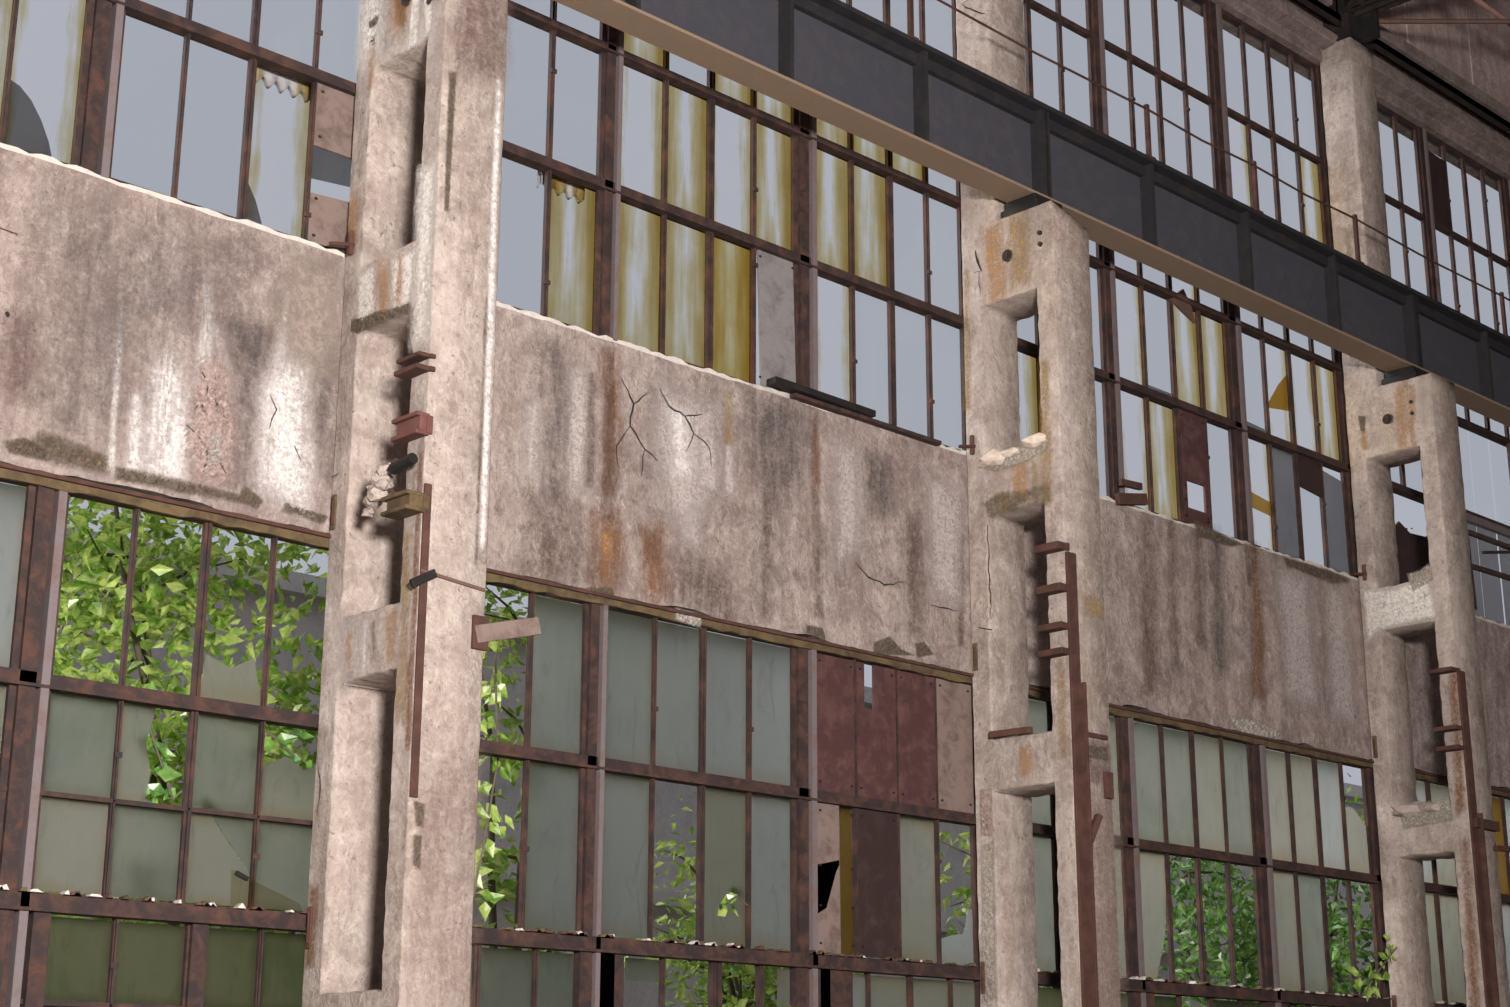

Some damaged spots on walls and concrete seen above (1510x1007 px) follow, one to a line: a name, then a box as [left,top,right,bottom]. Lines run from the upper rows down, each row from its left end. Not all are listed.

rust [986,218,1027,298]
spalling [351,302,411,333]
damp [68,237,330,509]
damp [752,402,802,548]
spalling [985,438,1047,471]
spalling [985,486,1048,516]
rust [1014,363,1051,503]